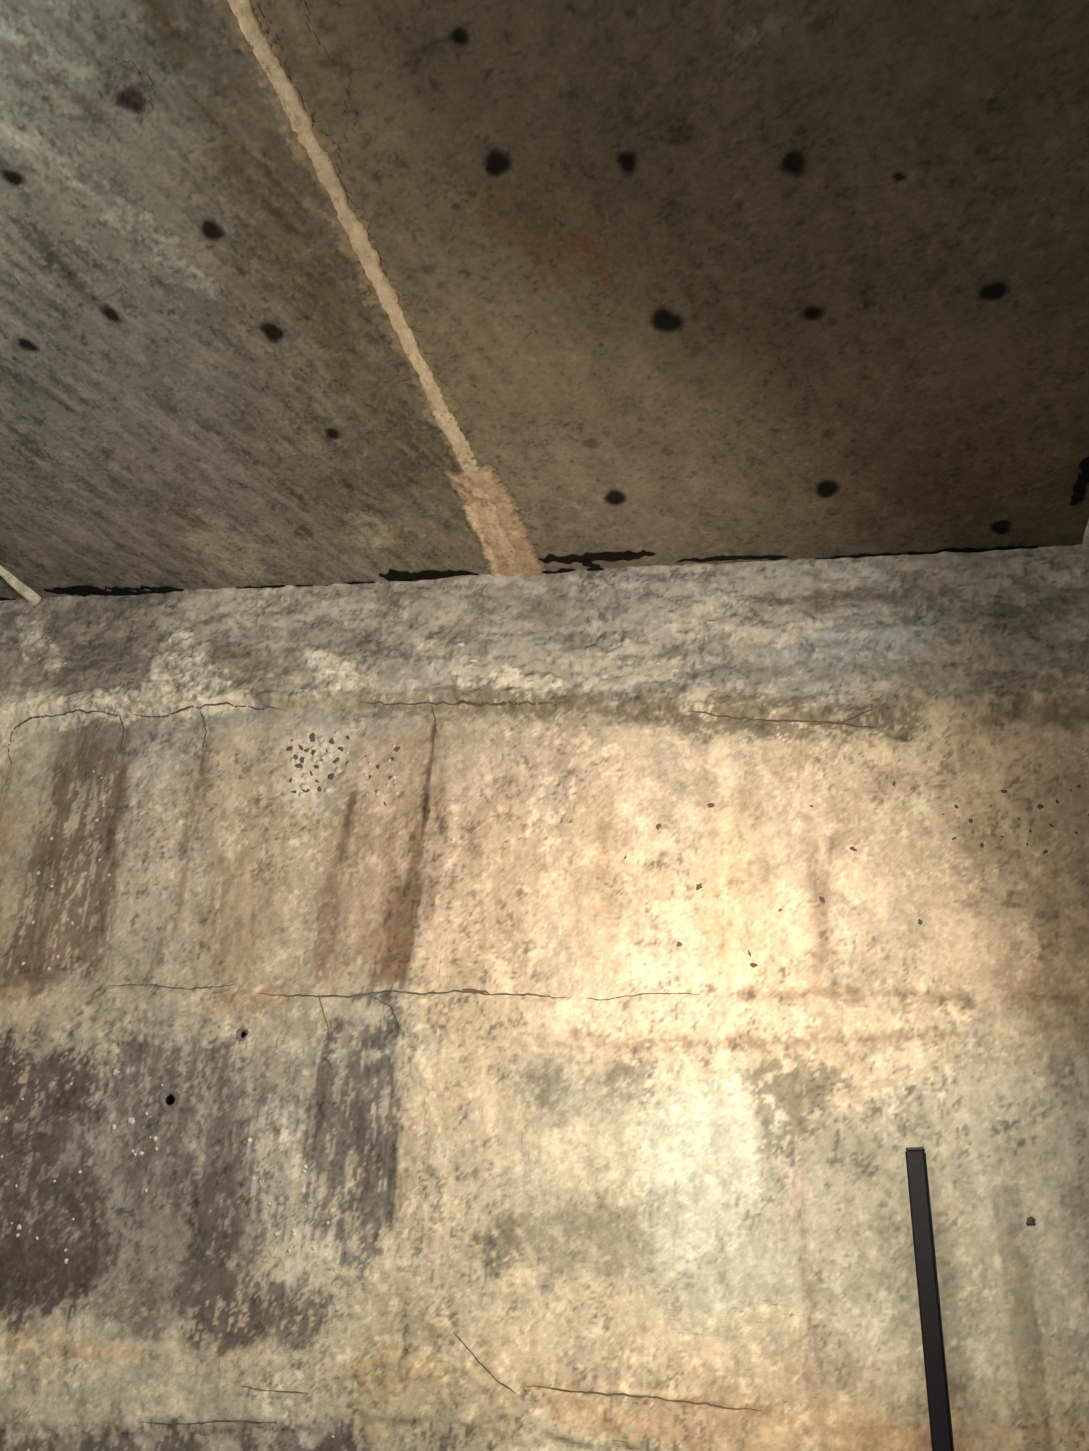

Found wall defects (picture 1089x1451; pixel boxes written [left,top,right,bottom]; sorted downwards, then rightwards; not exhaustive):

leakage [0,715,412,1361]
crack [111,984,700,1040]